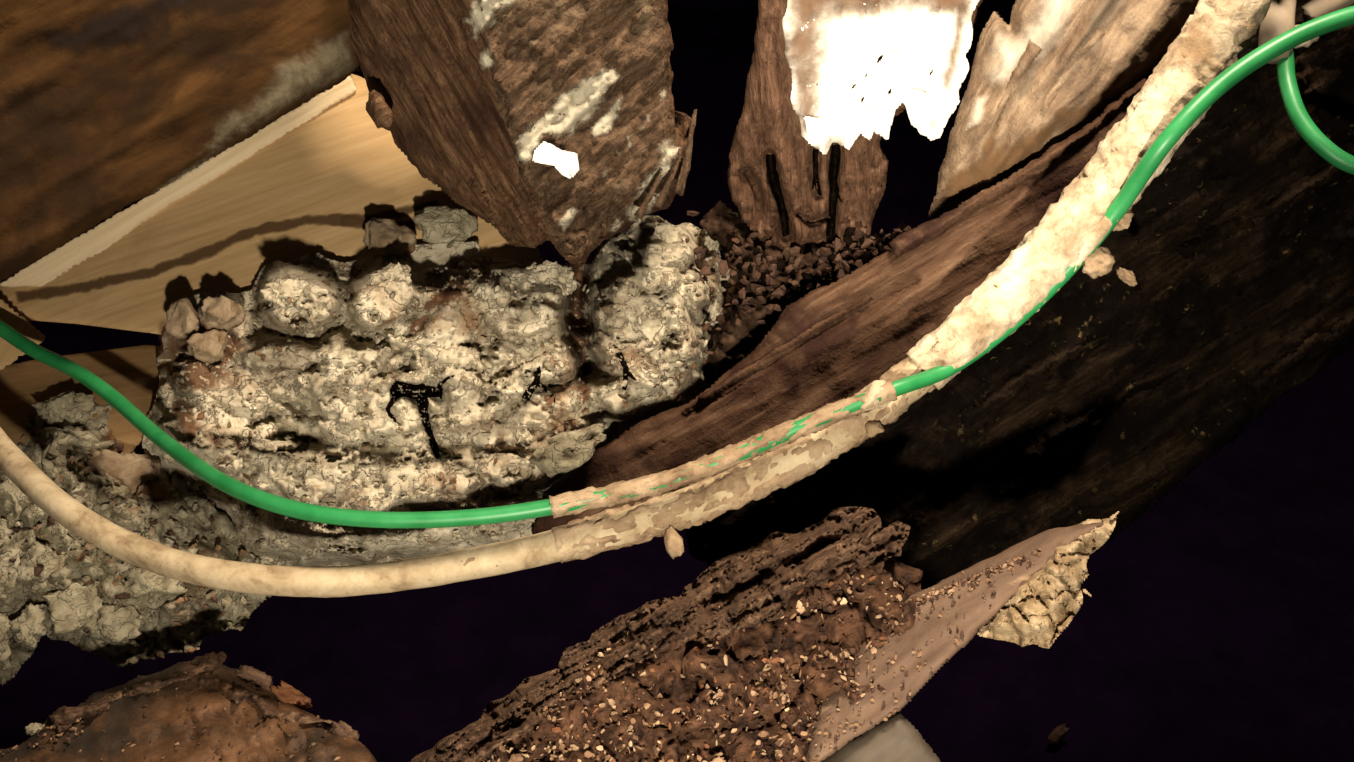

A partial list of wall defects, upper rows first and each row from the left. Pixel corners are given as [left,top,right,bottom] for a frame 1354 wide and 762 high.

crack [386,375,455,459]